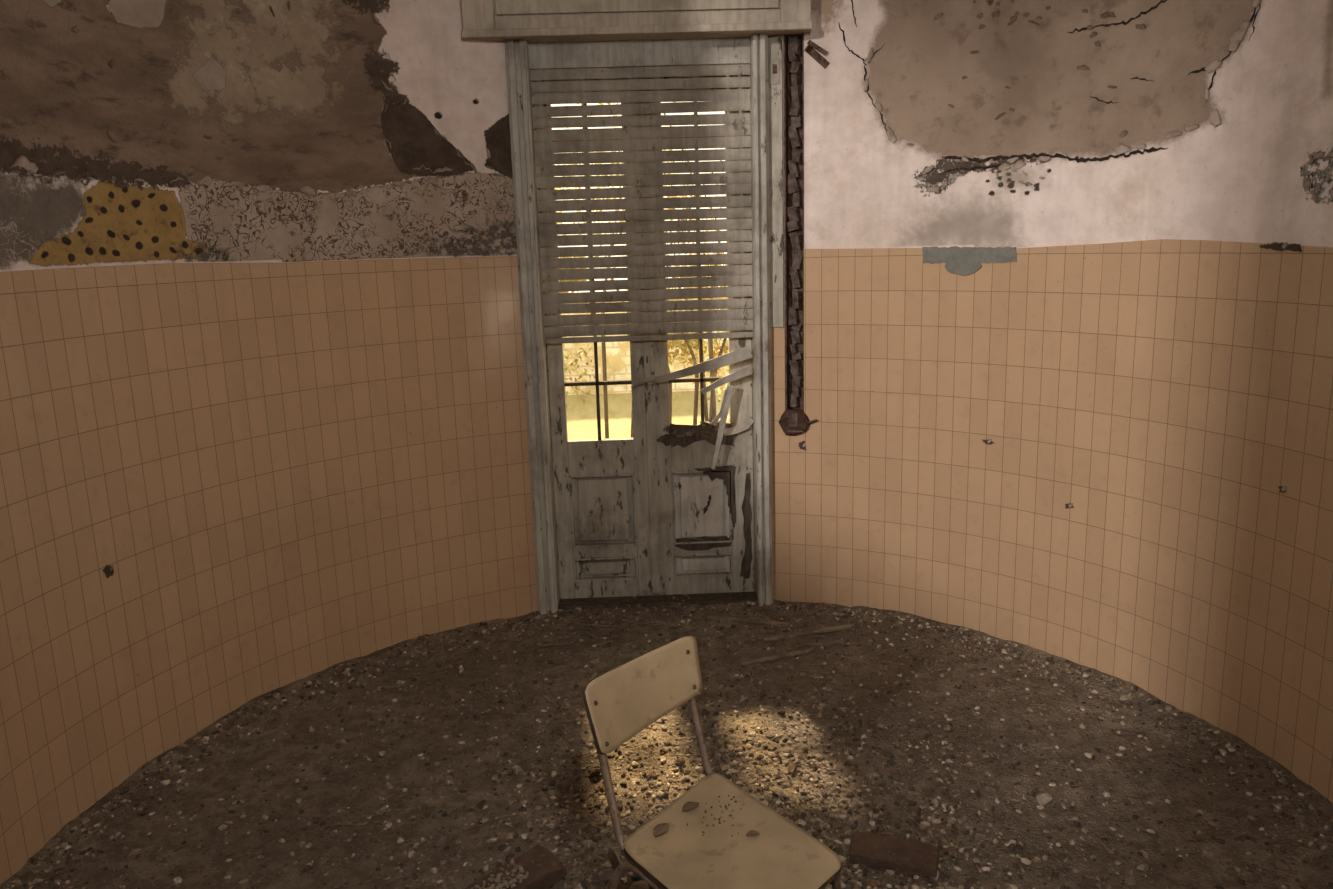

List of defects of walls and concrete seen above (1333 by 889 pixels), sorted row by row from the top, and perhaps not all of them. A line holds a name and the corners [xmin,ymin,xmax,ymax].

peeling [0,0,513,196]
crack [839,0,887,131]
crack [1066,0,1167,33]
crack [1188,0,1262,102]
spalling [914,156,1051,197]
peeling [1300,148,1333,205]